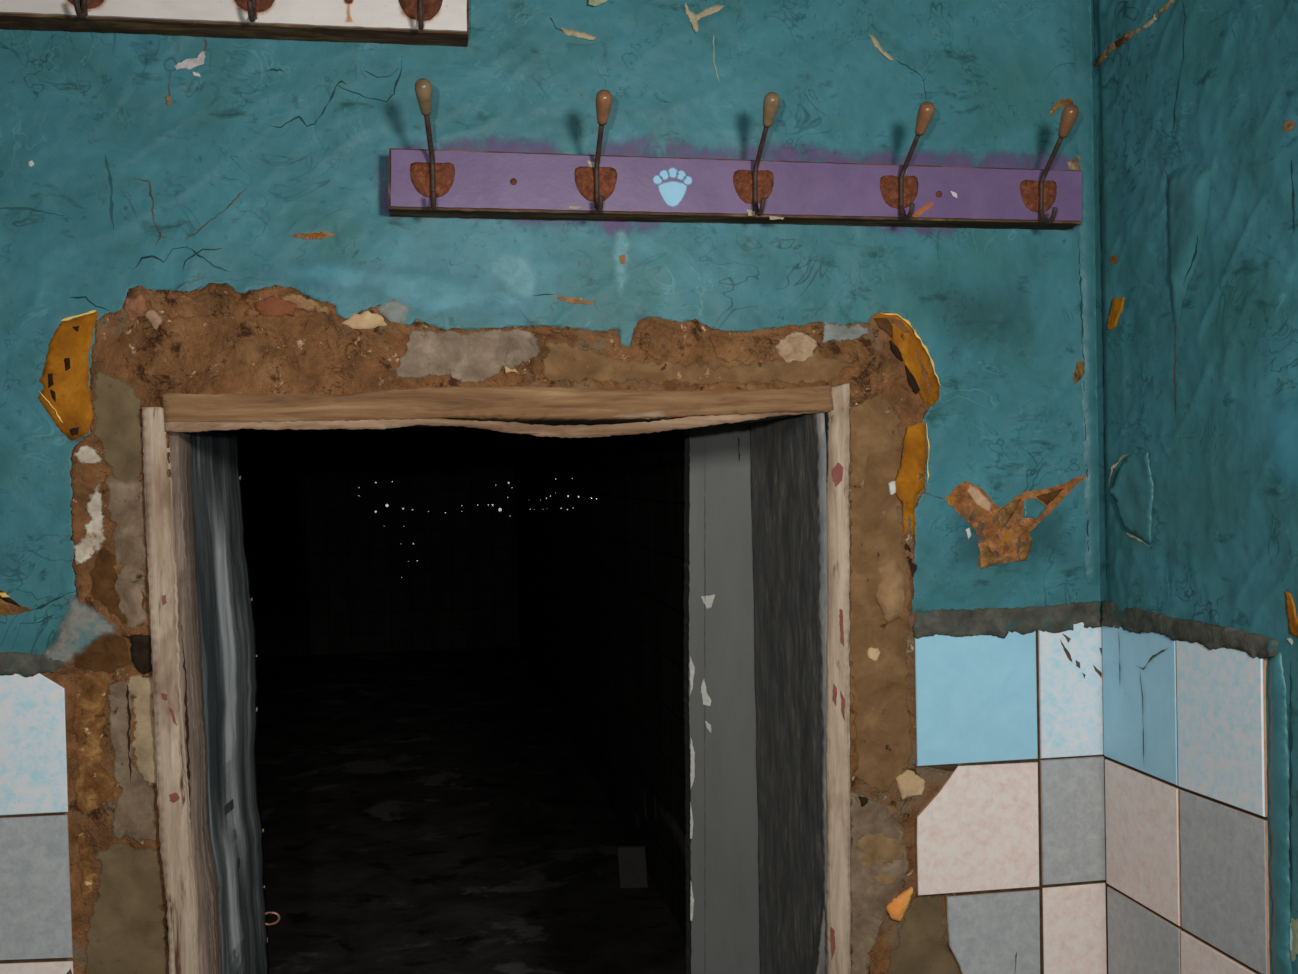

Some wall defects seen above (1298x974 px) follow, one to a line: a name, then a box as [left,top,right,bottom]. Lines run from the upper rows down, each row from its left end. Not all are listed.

peeling [550,17,597,40]
peeling [685,2,724,32]
peeling [1073,361,1084,384]
peeling [945,474,1089,569]
crack [20,591,75,624]
spalling [38,283,962,974]